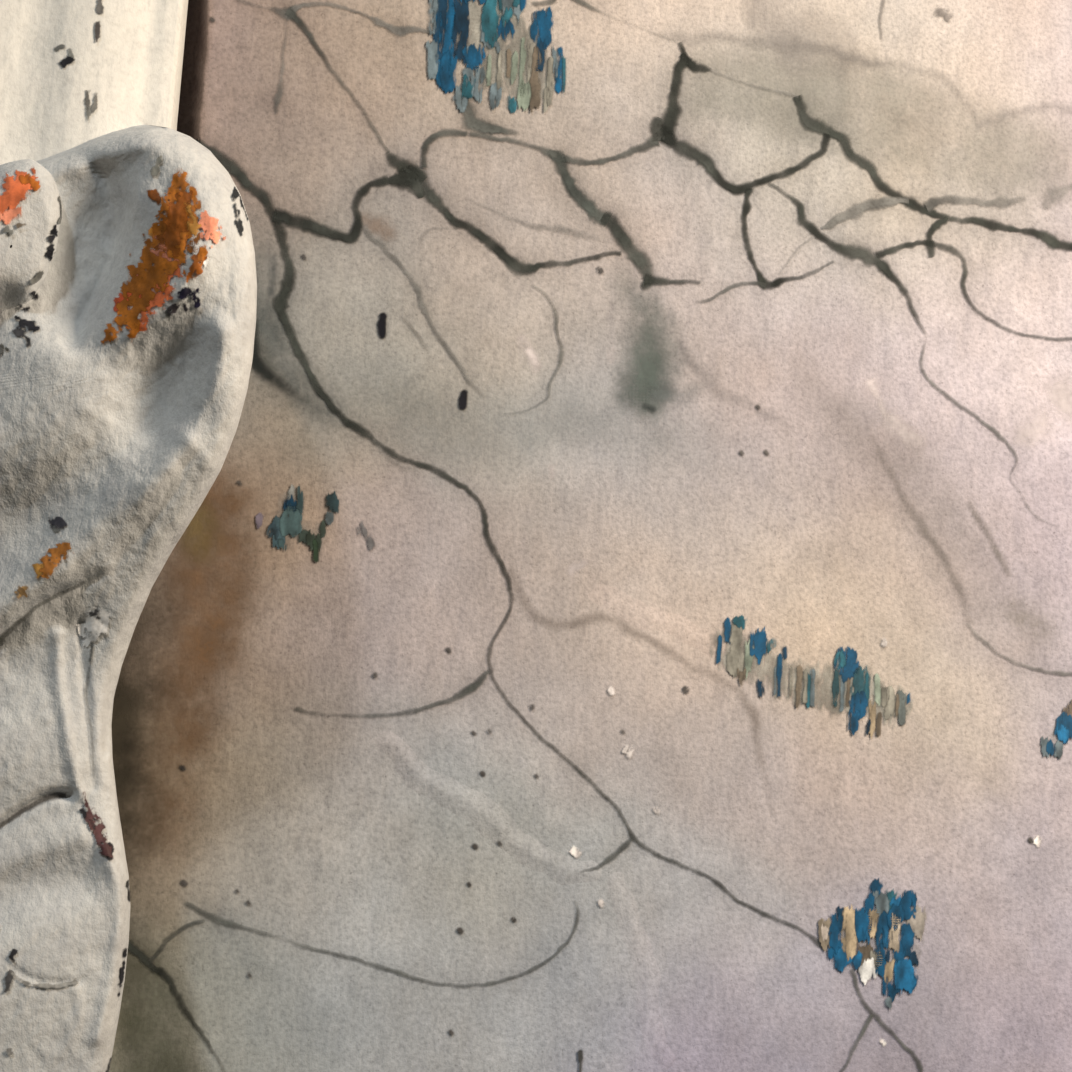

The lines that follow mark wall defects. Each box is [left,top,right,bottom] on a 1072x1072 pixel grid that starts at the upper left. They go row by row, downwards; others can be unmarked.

crack [276,3,327,62]
crack [345,7,430,35]
peeling [426,0,566,113]
crack [196,42,1072,712]
peeling [256,484,339,562]
peeling [715,615,912,739]
peeling [1041,700,1072,759]
crack [509,703,823,948]
crack [310,947,445,985]
crack [483,912,579,985]
peeling [818,878,926,1010]
crack [843,970,923,1072]